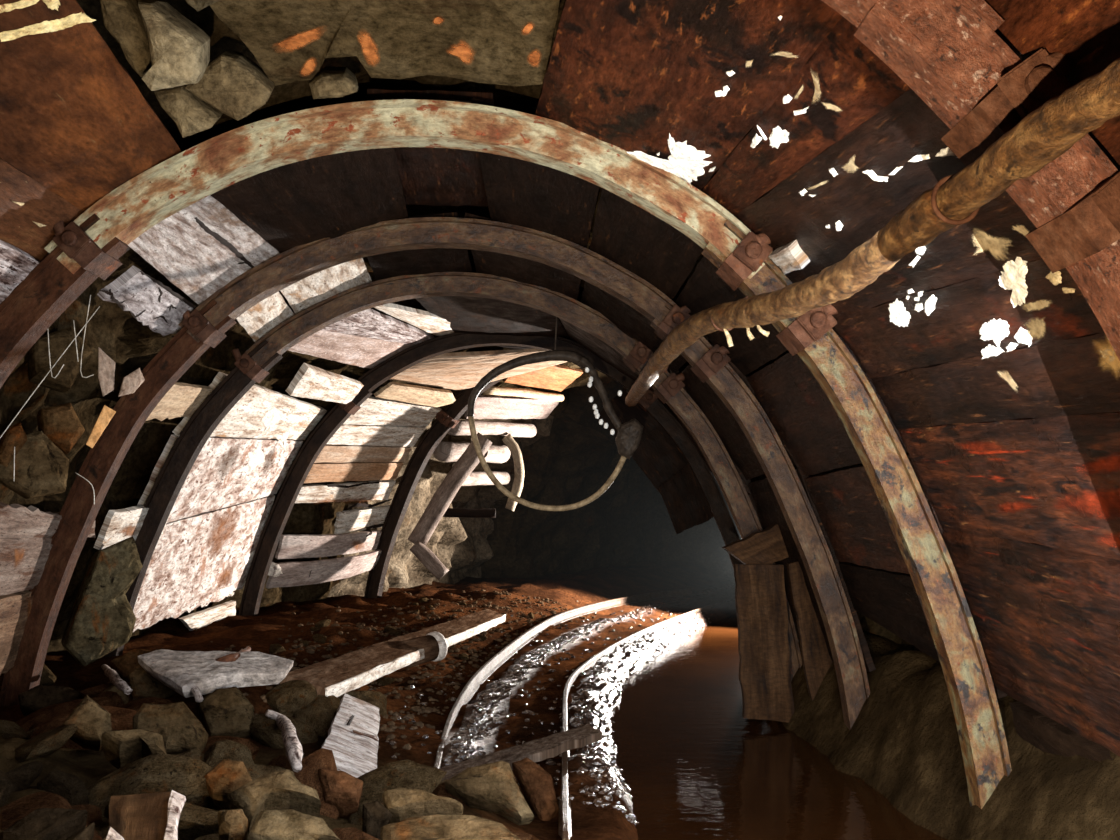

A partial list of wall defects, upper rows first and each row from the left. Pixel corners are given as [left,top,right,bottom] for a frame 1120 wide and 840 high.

peeling [0,0,95,42]